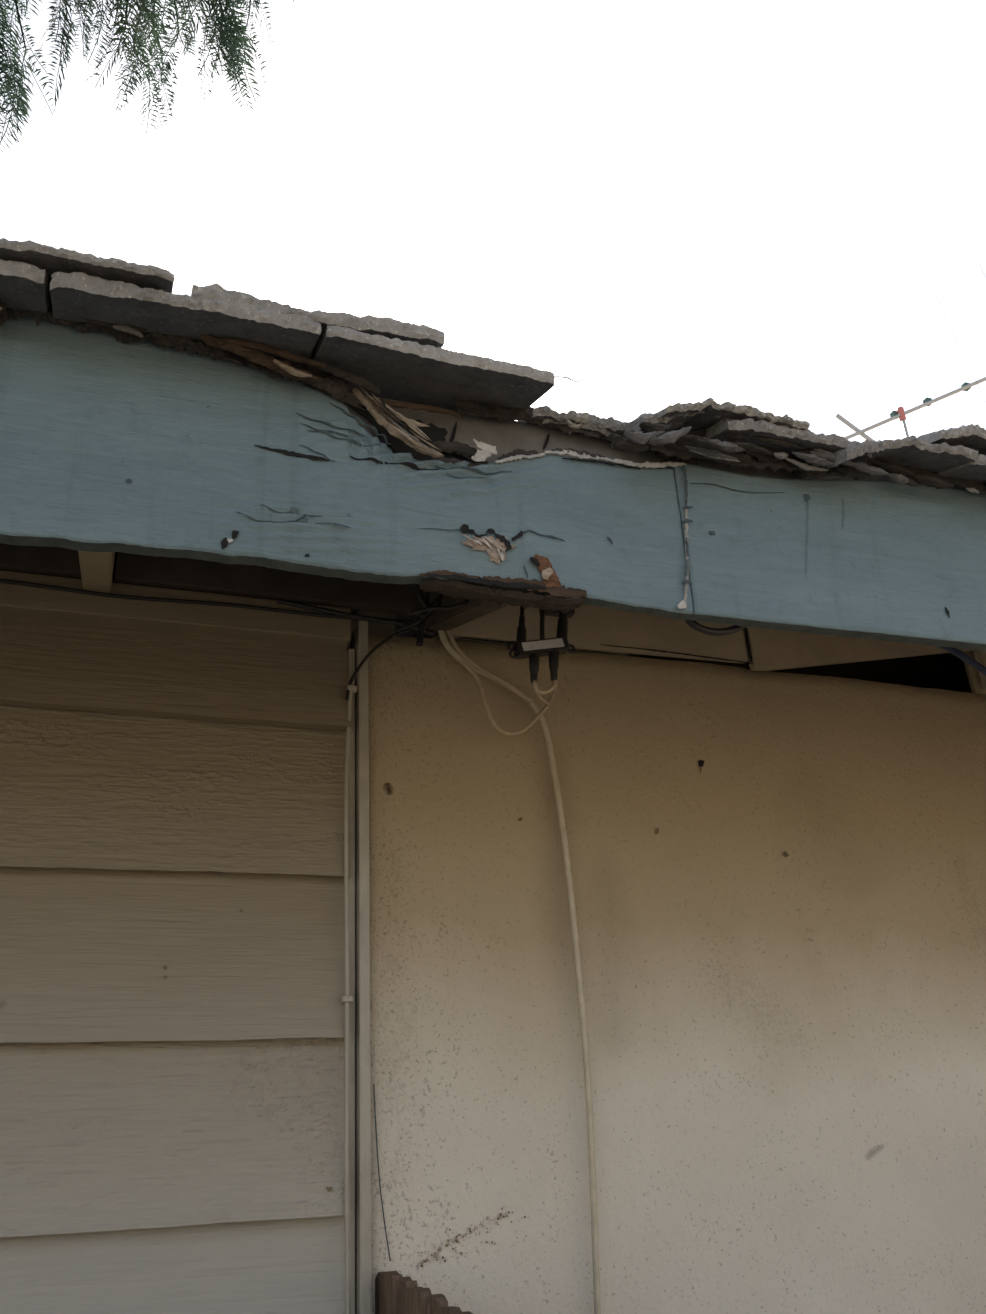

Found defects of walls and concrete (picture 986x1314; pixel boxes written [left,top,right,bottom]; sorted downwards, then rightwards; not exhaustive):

spalling [344,402,498,467]
crack [449,422,457,442]
peeling [417,524,565,564]